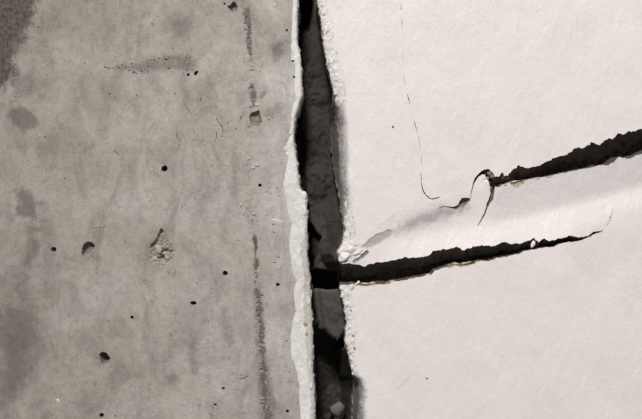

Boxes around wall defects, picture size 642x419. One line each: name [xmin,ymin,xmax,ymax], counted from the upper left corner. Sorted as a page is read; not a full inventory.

spalling [149,228,176,267]
crack [295,0,642,419]